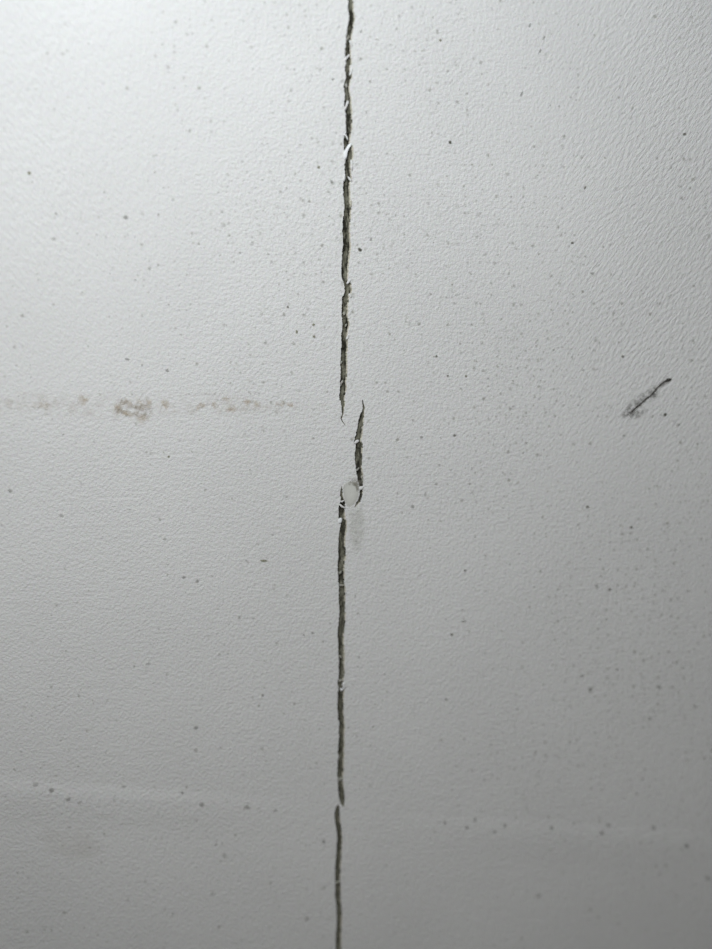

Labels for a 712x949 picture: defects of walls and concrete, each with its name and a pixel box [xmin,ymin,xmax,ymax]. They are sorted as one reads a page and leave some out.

crack [334,0,365,949]